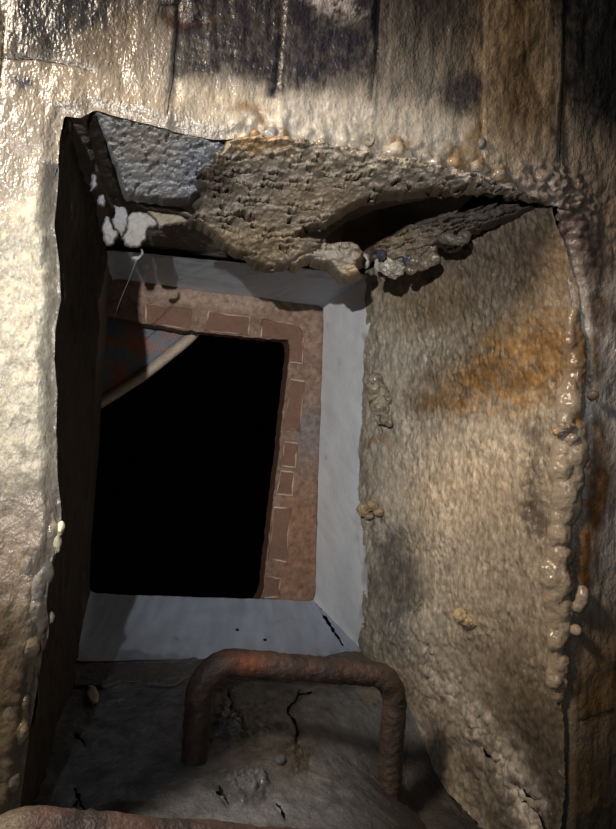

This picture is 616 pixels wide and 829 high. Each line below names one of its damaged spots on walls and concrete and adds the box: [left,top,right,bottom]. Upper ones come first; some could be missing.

damp [179,0,553,284]
corrosion [420,314,565,412]
damp [524,308,589,703]
crack [287,689,312,748]
crack [517,786,545,829]